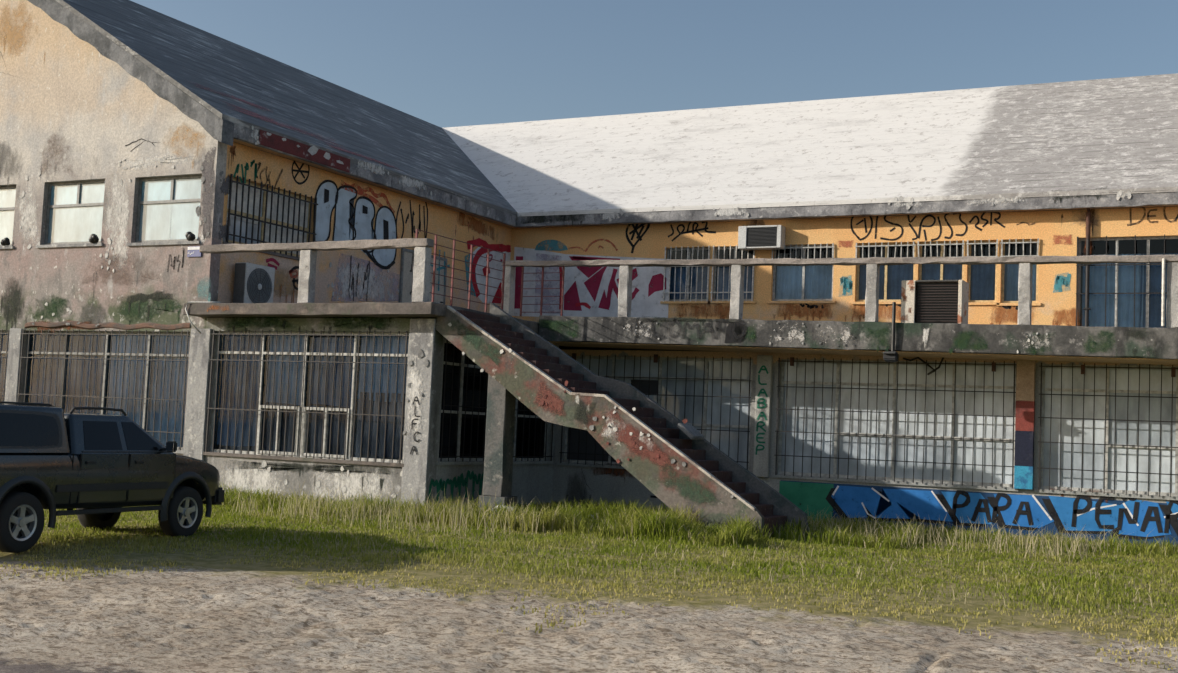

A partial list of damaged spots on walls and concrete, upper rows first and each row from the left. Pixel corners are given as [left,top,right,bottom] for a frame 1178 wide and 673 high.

damp [0,284,38,341]
damp [103,257,181,325]